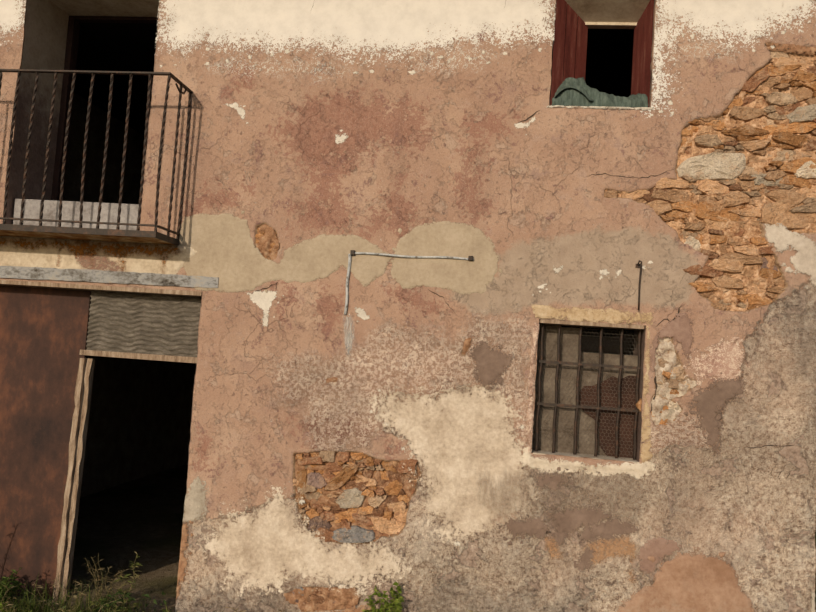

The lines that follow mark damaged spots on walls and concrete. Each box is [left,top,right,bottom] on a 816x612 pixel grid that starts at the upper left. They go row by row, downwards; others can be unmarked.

crack [589,169,673,178]
flaking render [604,0,816,311]
rust [0,238,179,268]
spalling [255,224,280,260]
flaking render [636,302,751,456]
flaking render [176,341,574,612]
peeling [573,514,638,572]